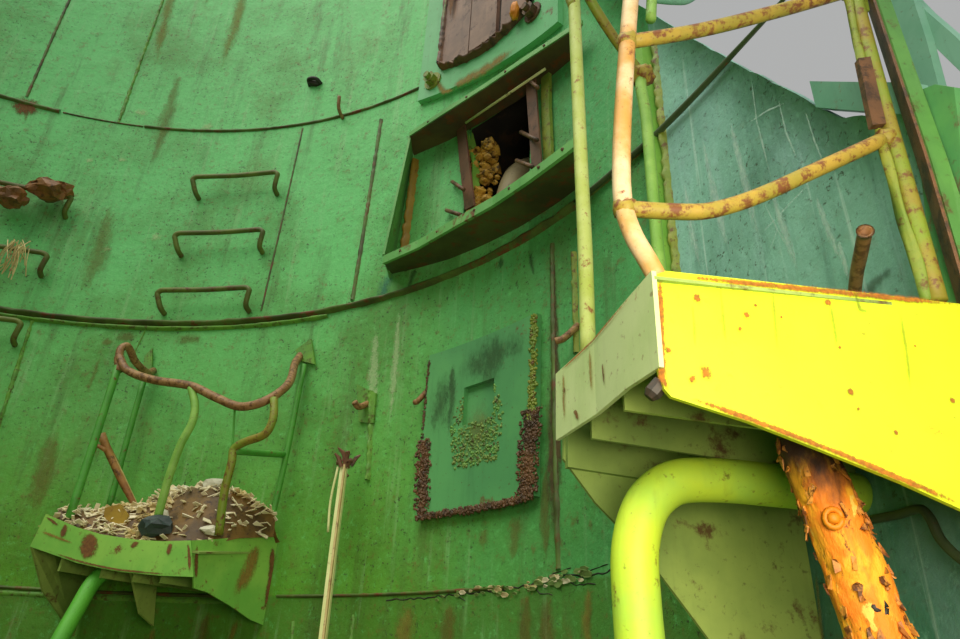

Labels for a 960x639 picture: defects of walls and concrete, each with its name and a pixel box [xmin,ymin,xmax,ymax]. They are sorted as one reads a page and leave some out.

rust [13,99,38,114]
rust [697,276,946,305]
rust [658,282,672,388]
rust [698,400,953,501]
rust [45,517,69,542]
rust [58,534,162,574]
rust [187,545,198,577]
rust [237,547,275,607]